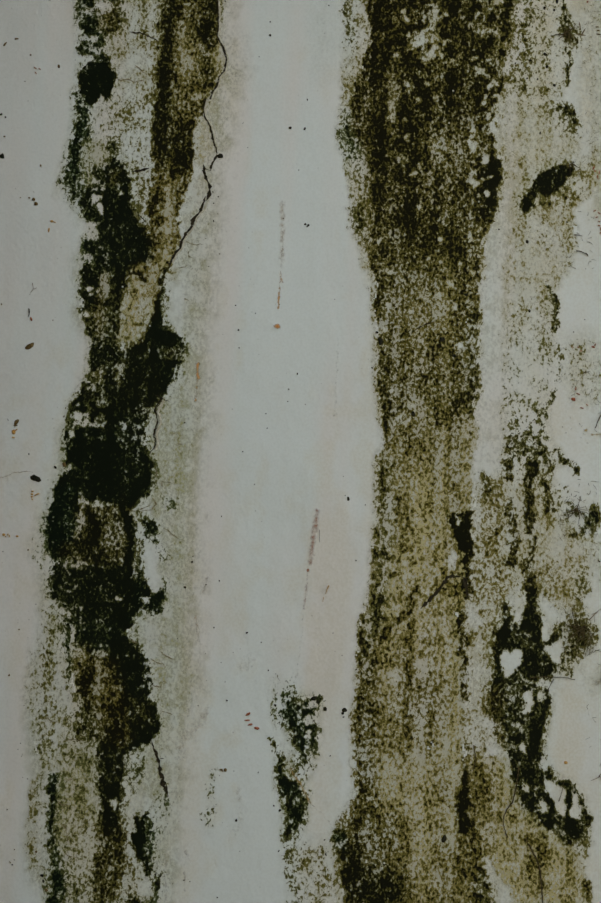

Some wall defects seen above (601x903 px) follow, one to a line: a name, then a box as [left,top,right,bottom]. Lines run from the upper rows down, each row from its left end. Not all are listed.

leakage [25,0,227,903]
crack [167,0,227,271]
leakage [267,0,601,903]